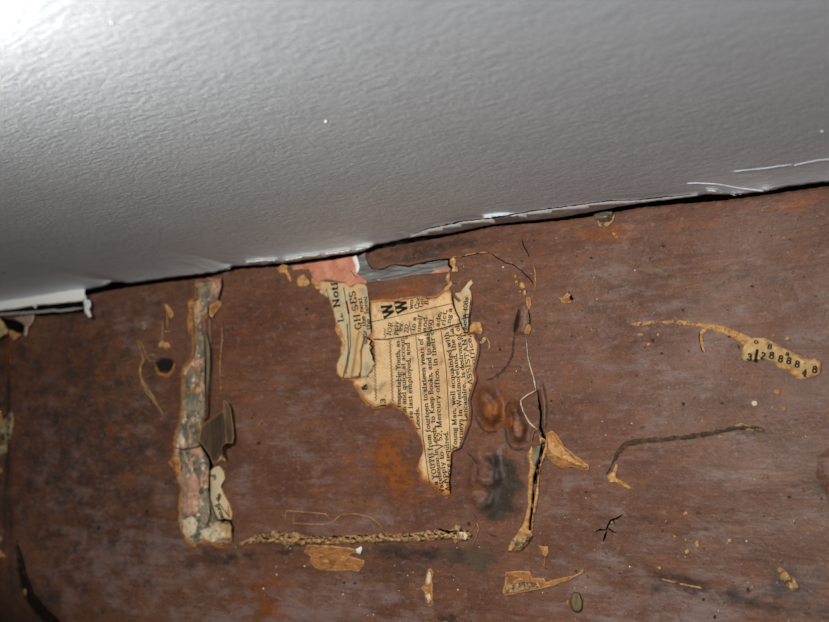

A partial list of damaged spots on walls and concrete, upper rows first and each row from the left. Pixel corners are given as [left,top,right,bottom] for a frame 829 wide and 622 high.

peeling [202,301,221,418]
peeling [453,332,481,451]
corrosion [475,386,523,432]
spalling [546,431,589,471]
crack [606,426,760,474]
crack [17,542,60,622]
peeling [268,505,472,585]
peeling [498,568,584,601]